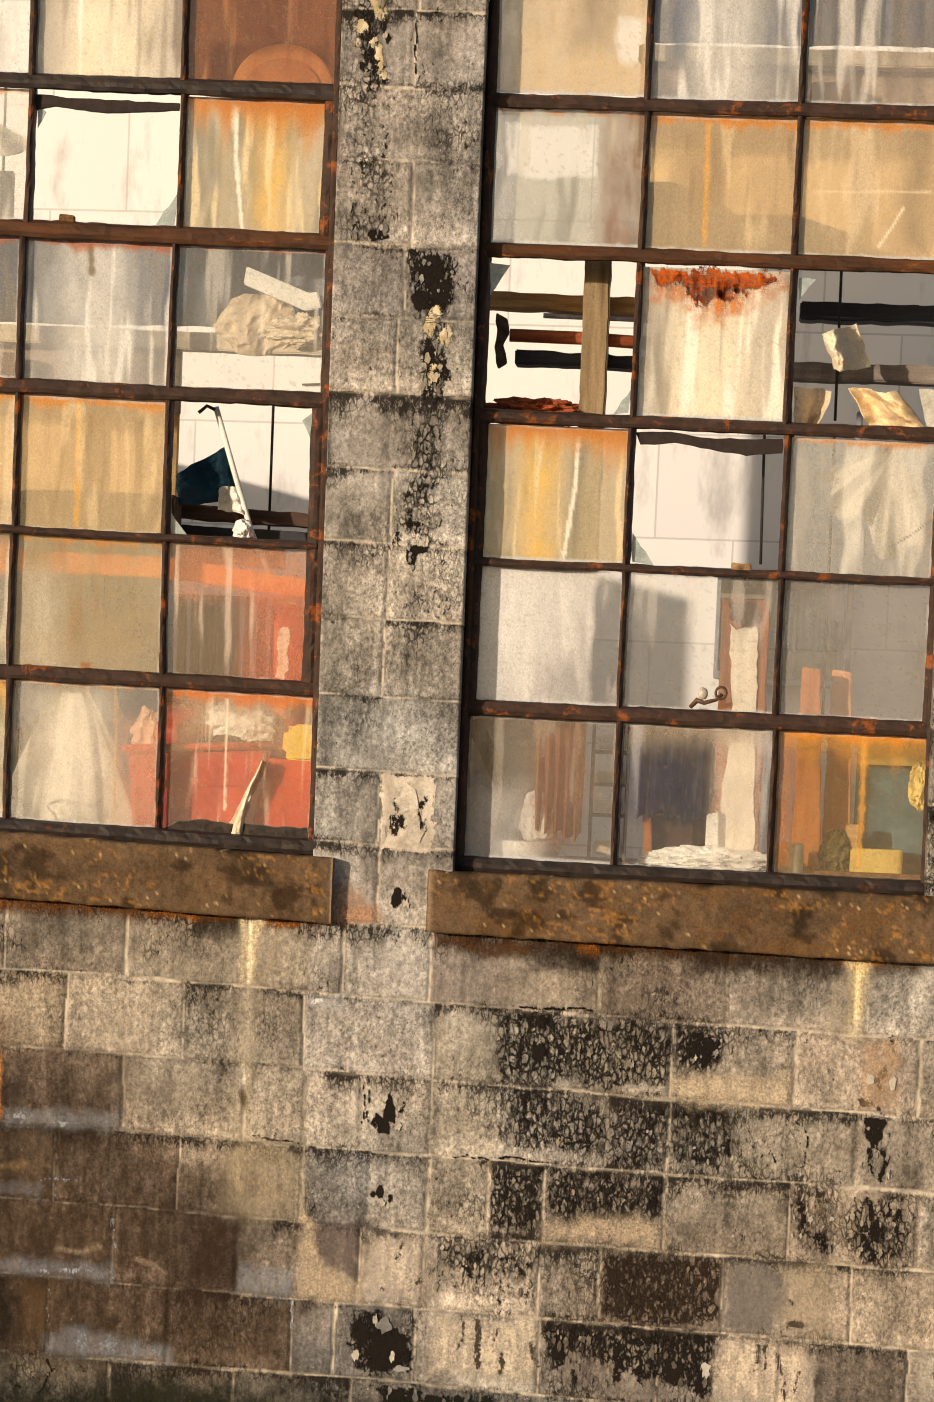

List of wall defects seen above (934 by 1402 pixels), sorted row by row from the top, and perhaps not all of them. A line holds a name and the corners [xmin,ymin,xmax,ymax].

peeling [347,0,394,241]
peeling [392,249,457,654]
peeling [377,772,438,854]
water stain [241,918,275,984]
water stain [0,1058,294,1365]